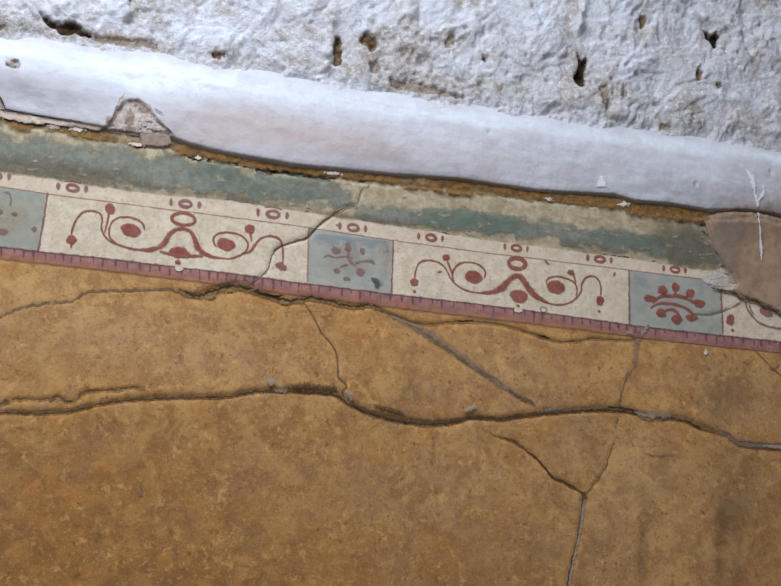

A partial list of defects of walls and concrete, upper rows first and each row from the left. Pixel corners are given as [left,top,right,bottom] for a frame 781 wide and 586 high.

spalling [0,95,176,146]
peeling [702,268,731,289]
crack [0,185,781,586]